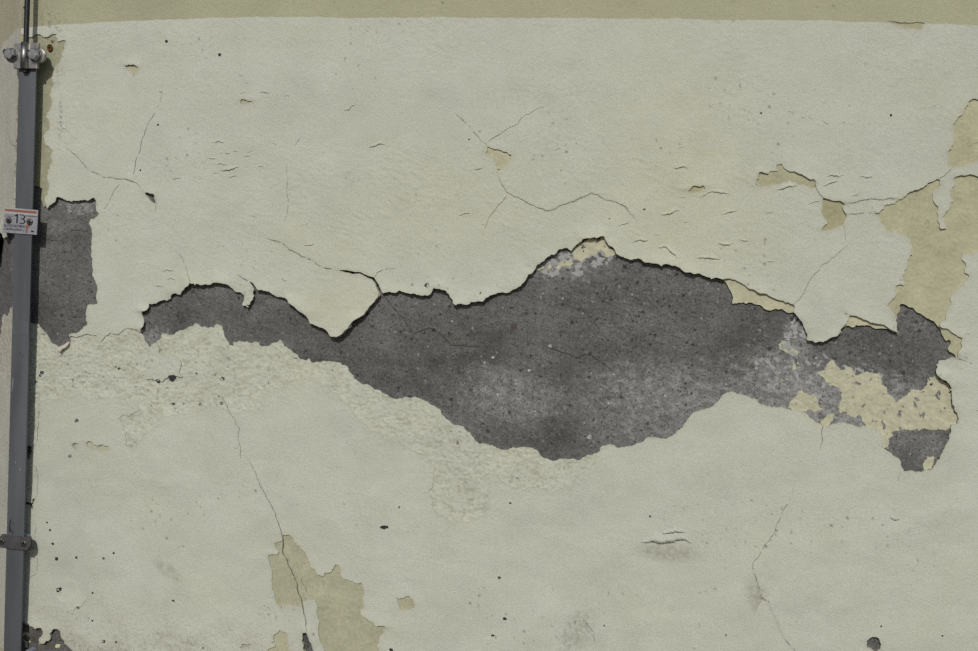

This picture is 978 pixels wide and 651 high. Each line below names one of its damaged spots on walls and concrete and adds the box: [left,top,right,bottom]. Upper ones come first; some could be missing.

spalling [0,233,15,378]
crack [265,138,472,347]
spalling [27,34,978,521]
crack [221,395,307,626]
spalling [22,622,72,651]
peeling [268,535,393,651]
peeling [397,596,415,610]